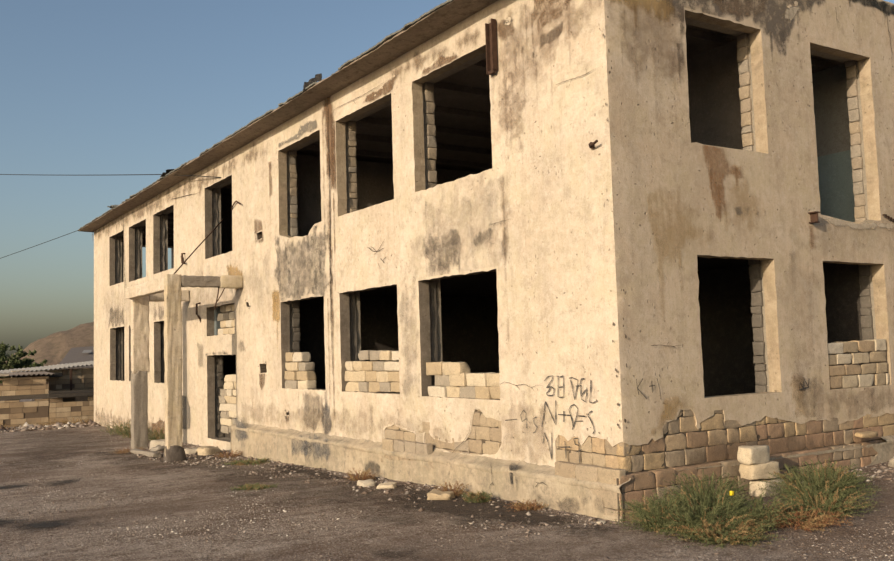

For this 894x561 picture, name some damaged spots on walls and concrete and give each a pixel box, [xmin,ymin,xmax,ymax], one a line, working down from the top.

leakage [619,0,824,51]
leakage [322,96,336,188]
corrosion [704,145,741,215]
leakage [272,213,335,320]
leakage [292,405,331,459]
spalling [381,409,502,470]
spalling [547,409,894,522]